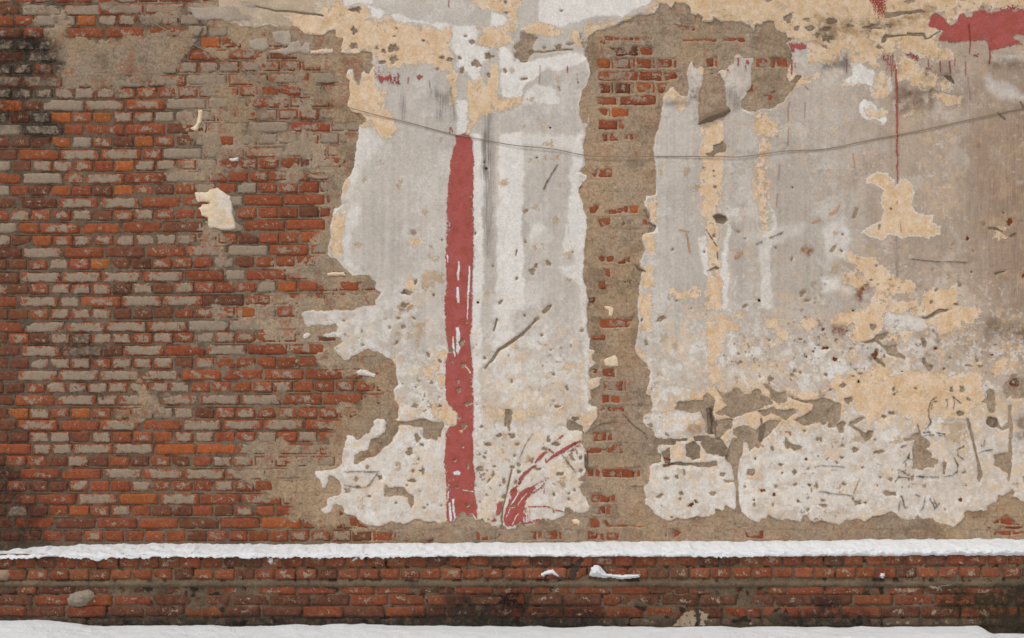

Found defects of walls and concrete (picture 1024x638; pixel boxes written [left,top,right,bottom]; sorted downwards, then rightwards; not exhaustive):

spalling [208,0,1024,545]